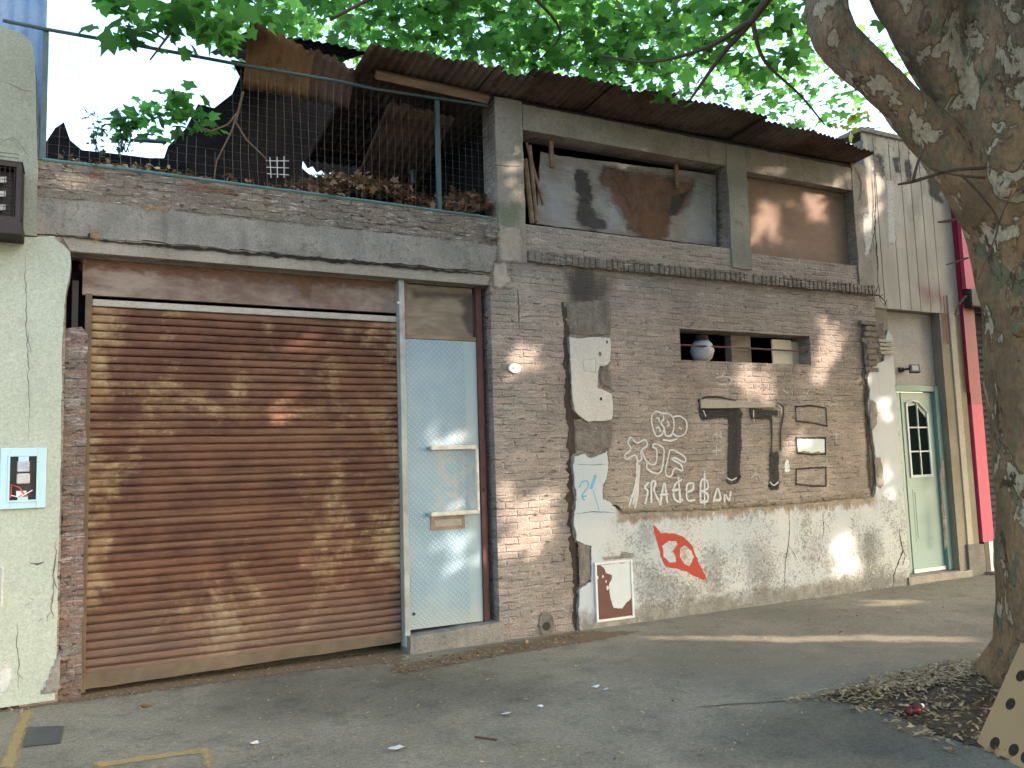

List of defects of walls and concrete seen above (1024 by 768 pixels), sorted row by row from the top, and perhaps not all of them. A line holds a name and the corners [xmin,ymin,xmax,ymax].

crack [24,256,34,435]
flaking render [567,300,615,454]
crack [47,542,58,619]
peeling [578,543,634,608]
crack [893,529,905,587]
spalling [41,643,75,694]